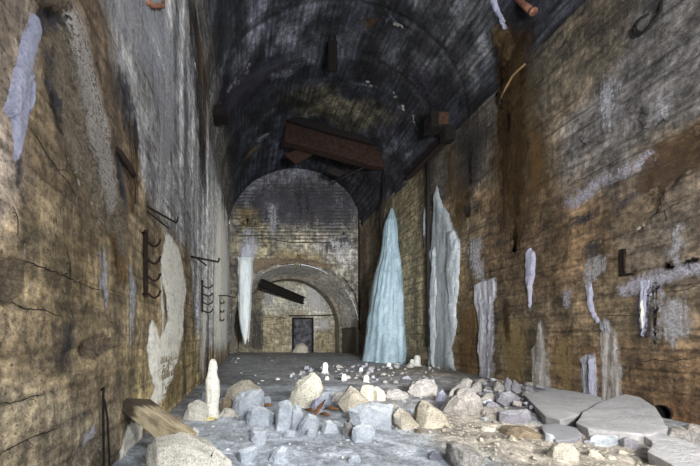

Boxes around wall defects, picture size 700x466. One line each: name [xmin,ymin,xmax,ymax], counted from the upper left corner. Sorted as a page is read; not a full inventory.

water stain [4,13,63,184]
crack [31,129,79,228]
water stain [566,150,652,209]
crack [13,303,60,316]
crack [10,250,123,298]
water stain [147,234,186,404]
water stain [619,225,700,349]